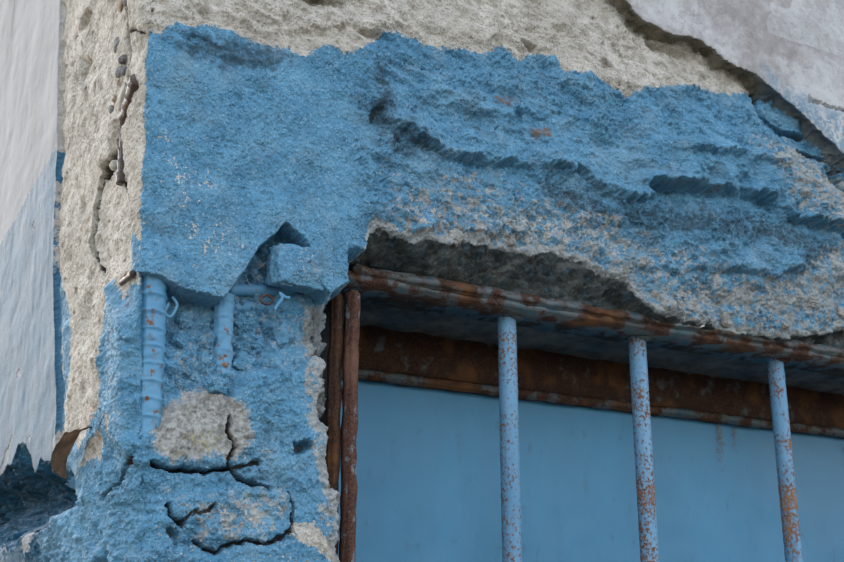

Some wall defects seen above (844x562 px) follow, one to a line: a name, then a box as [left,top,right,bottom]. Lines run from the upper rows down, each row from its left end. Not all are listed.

crack [125,0,146,81]
spalling [148,0,844,175]
spalling [0,0,152,558]
crack [88,112,130,274]
spalling [232,221,312,288]
spalling [380,204,833,332]
spalling [138,271,331,462]
crack [100,414,297,555]